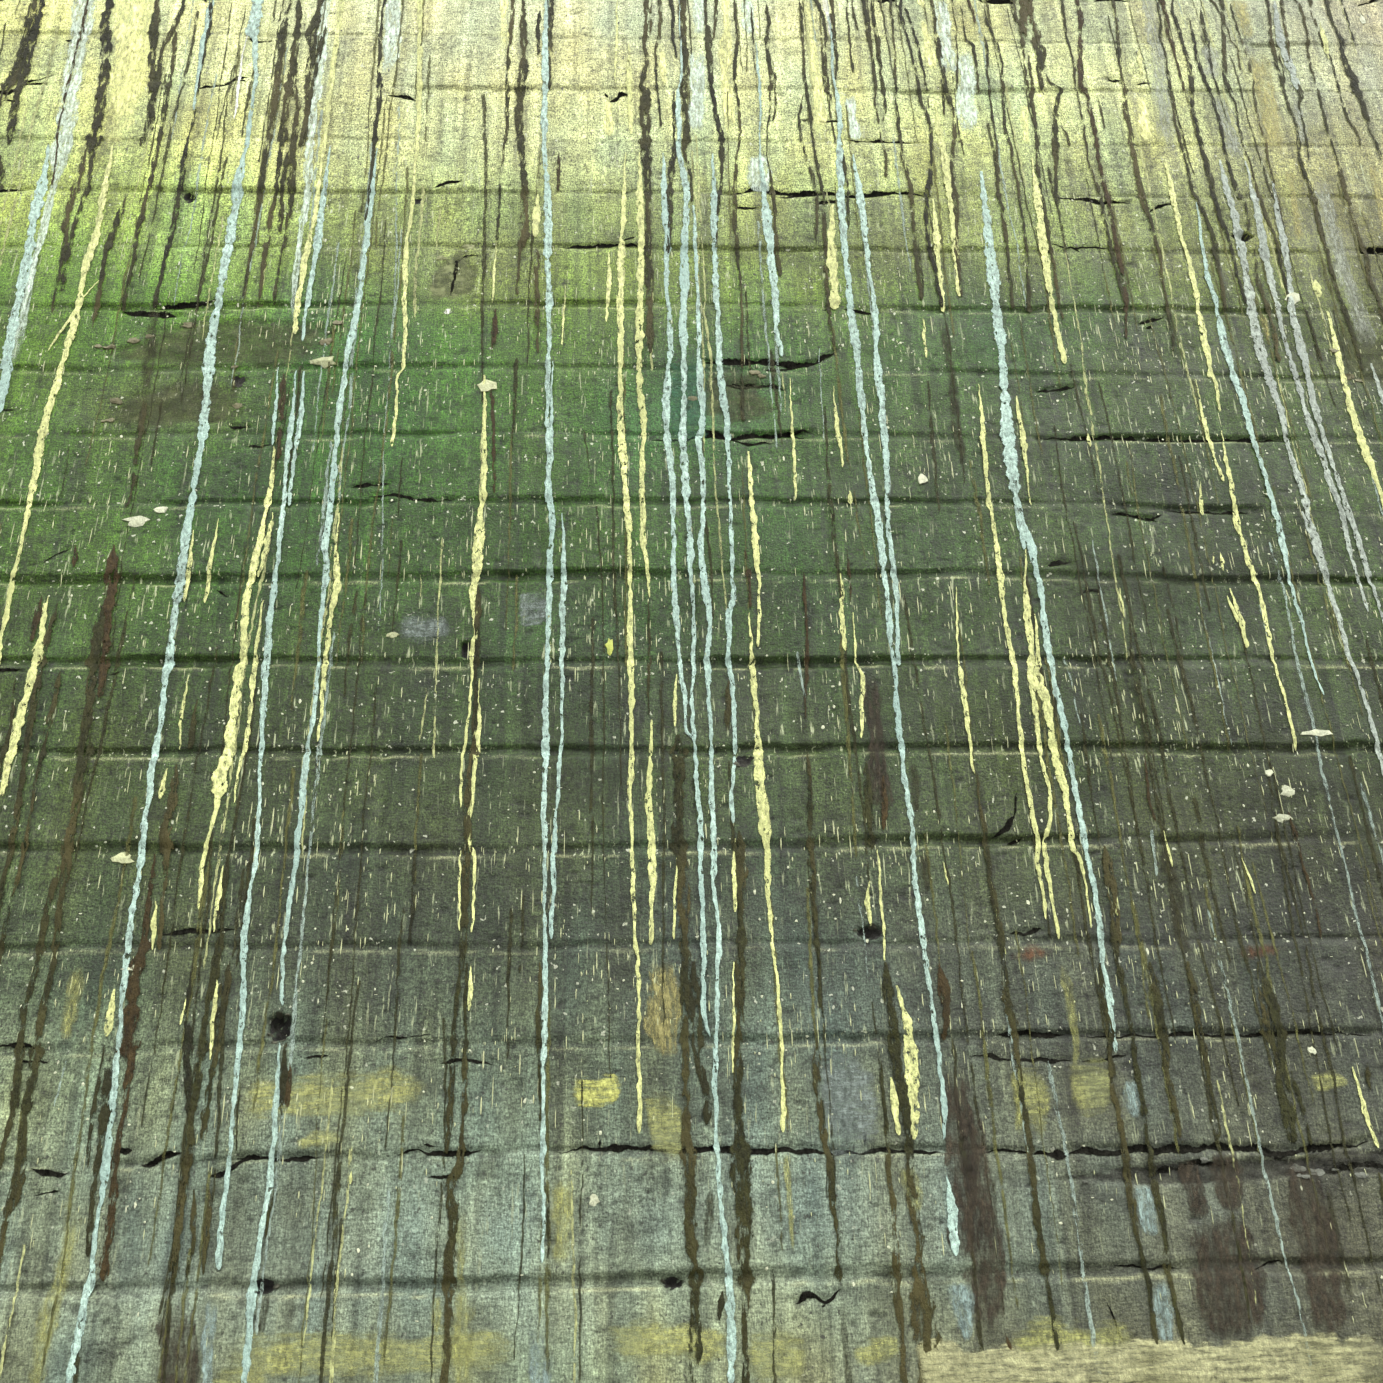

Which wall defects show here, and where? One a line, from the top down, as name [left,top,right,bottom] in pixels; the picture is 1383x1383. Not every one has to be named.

leakage [6,0,45,145]
leakage [107,0,186,145]
leakage [241,0,327,308]
leakage [540,0,554,502]
leakage [635,152,692,738]
leakage [821,47,901,666]
leakage [1010,0,1047,90]
leakage [1164,159,1221,411]
leakage [1170,0,1281,361]
crack [0,0,654,1383]
leakage [468,678,482,932]
crack [513,0,1383,1383]